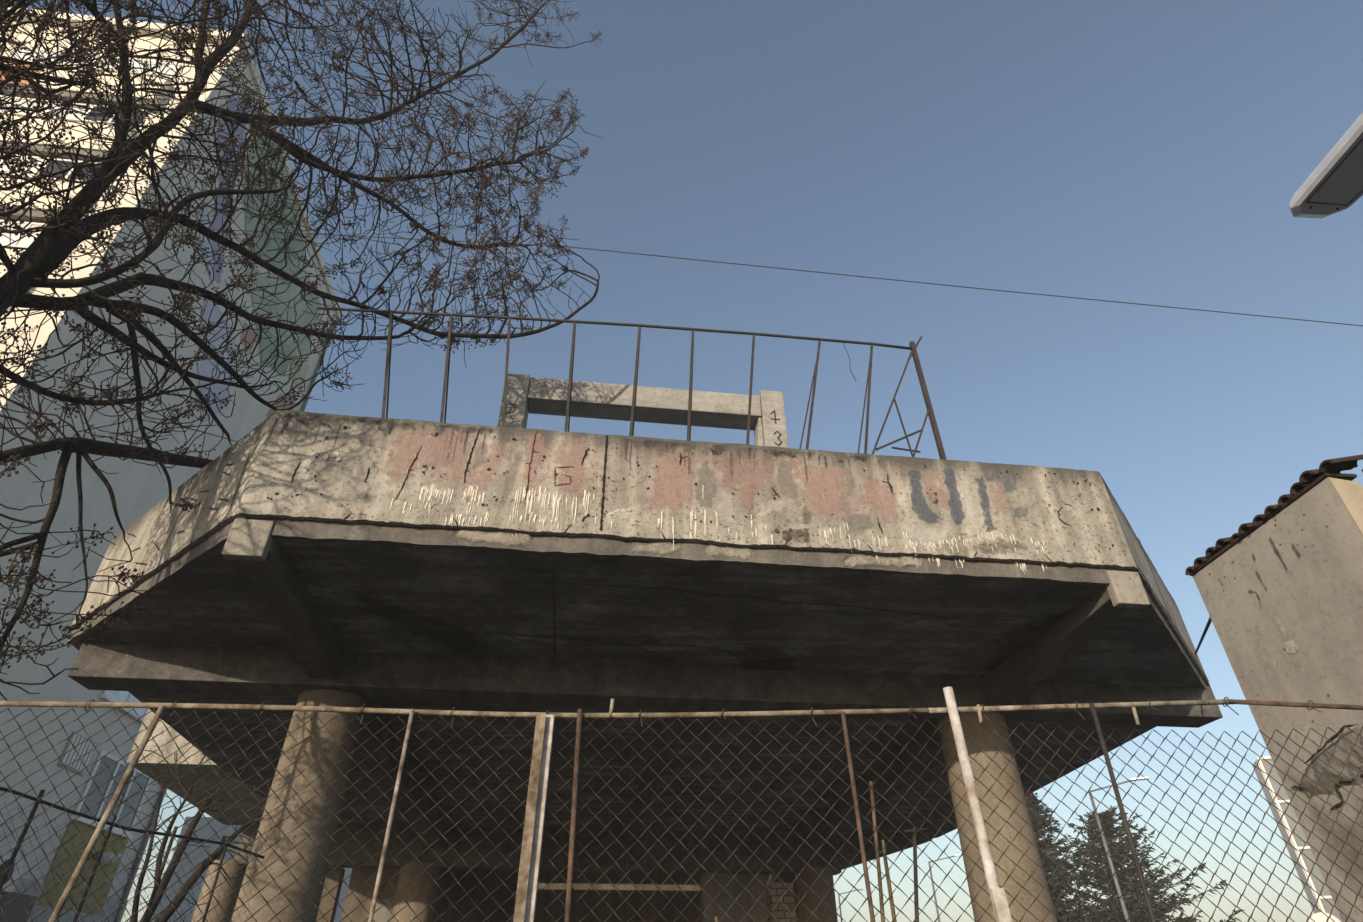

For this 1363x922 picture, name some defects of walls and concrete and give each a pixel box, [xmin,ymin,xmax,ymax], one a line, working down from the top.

crack [71,428,1209,681]
crack [1291,724,1363,810]